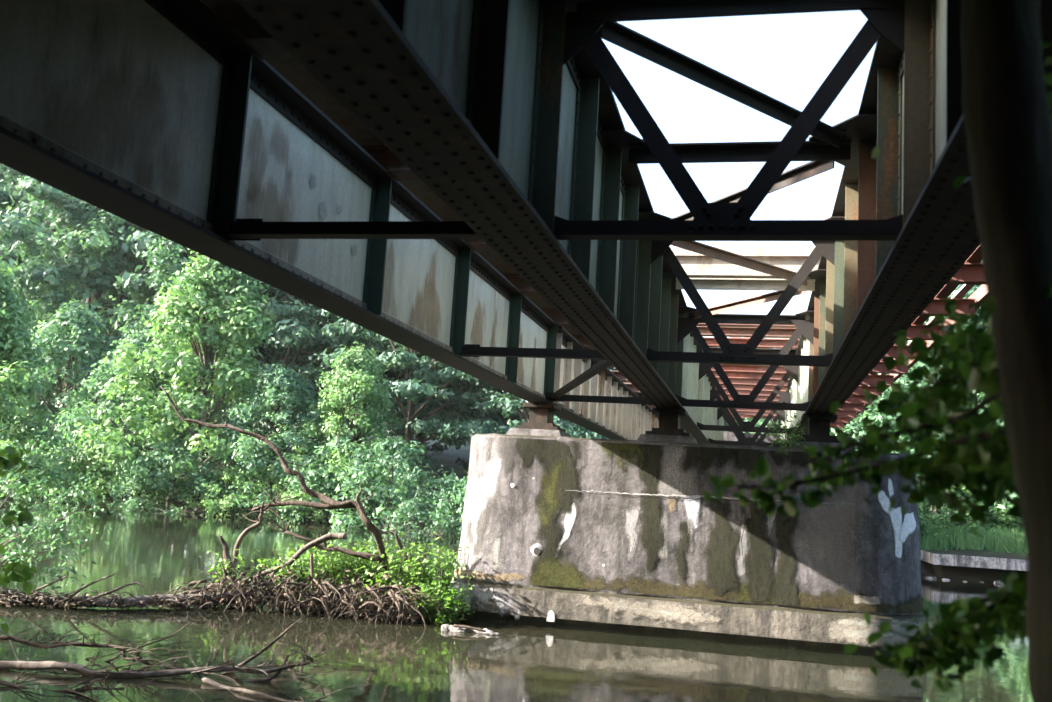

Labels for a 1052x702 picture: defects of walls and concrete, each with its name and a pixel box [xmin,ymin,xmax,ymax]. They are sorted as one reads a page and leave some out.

damp [465,437,544,555]
damp [556,503,576,557]
damp [626,509,639,558]
damp [656,445,868,592]